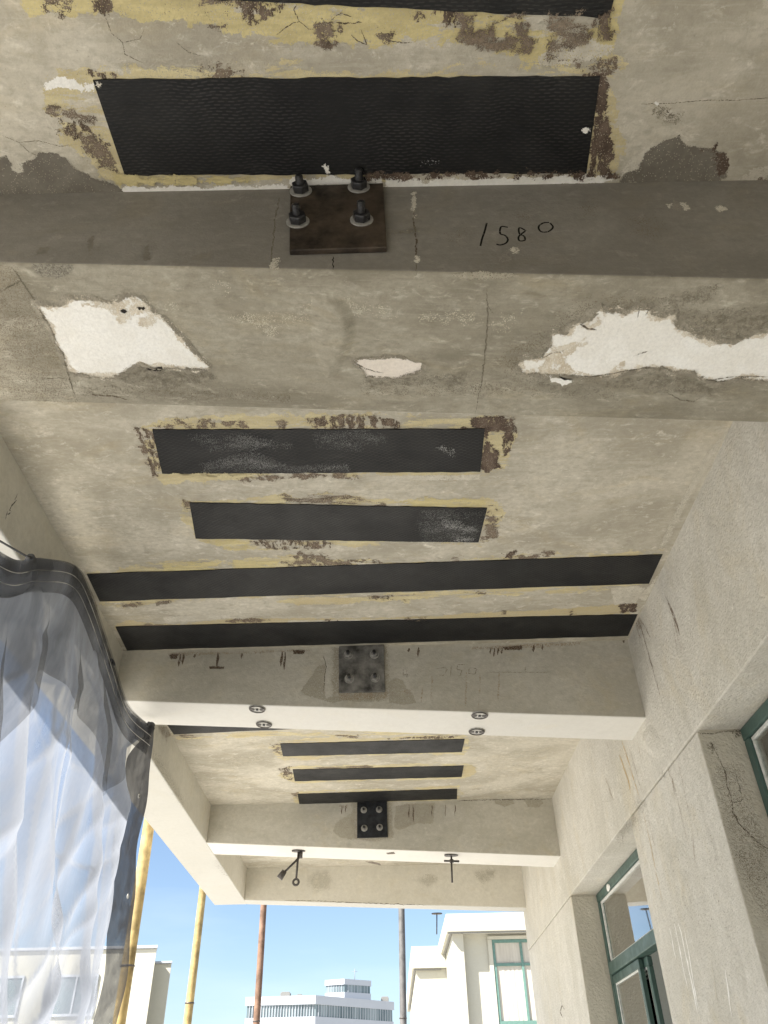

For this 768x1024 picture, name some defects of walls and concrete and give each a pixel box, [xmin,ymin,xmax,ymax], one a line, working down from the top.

crack [279,6,409,45]
leakage [0,0,730,194]
peeling [31,292,218,388]
peeling [348,354,470,391]
crack [475,288,491,412]
peeling [515,281,768,402]
crack [710,741,768,849]